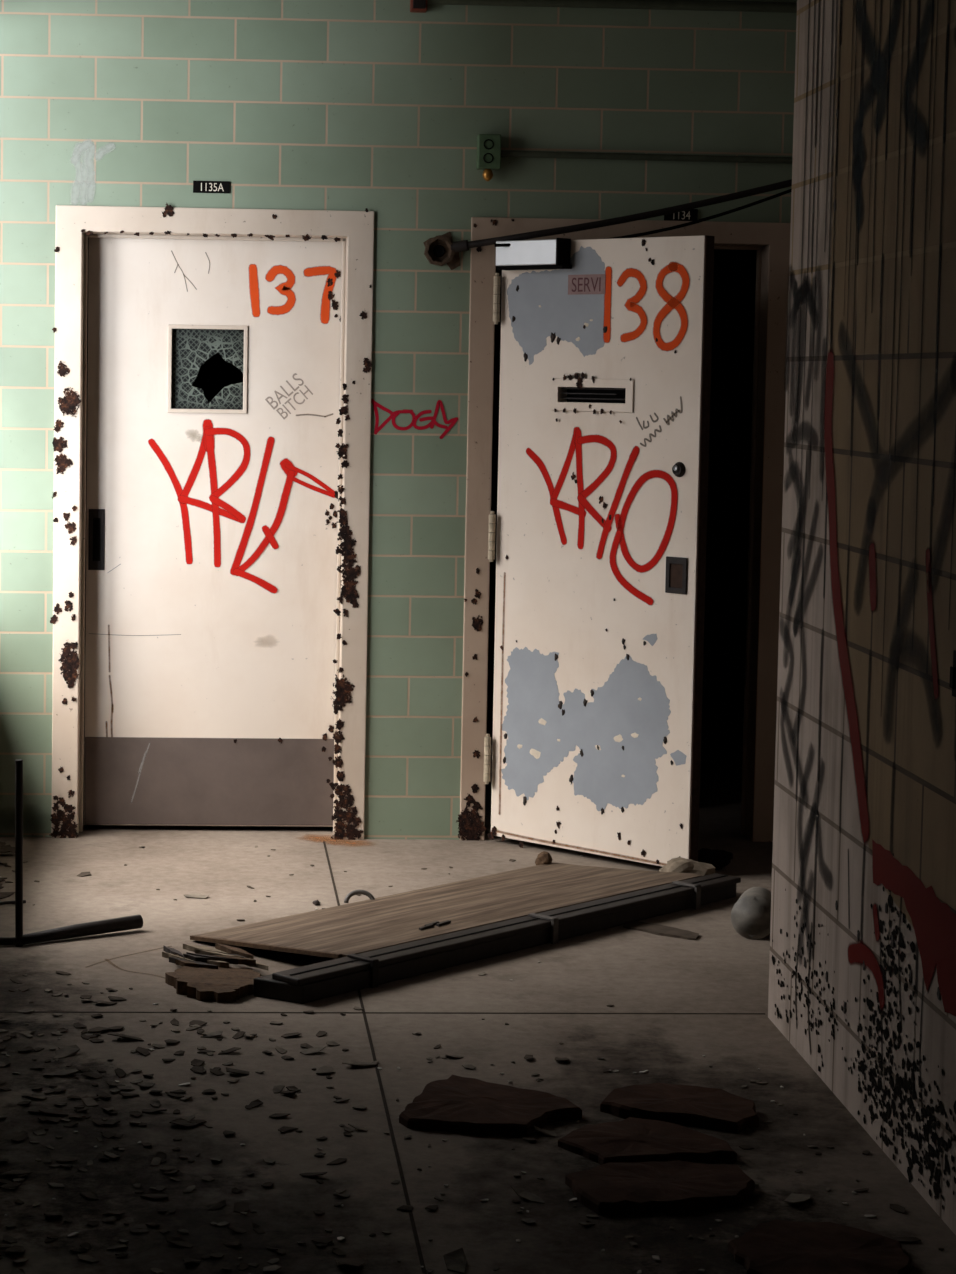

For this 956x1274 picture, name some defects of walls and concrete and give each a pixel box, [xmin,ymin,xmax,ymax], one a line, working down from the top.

peeling [507,246,607,365]
corrosion [52,360,81,474]
peeling [552,372,595,390]
corrosion [50,592,76,624]
corrosion [58,640,80,704]
corrosion [306,667,368,845]
corrosion [325,484,361,617]
peeling [501,638,687,814]
peeling [643,634,658,646]
damp [865,424,936,798]
damp [772,835,956,1210]
damp [468,1145,829,1274]